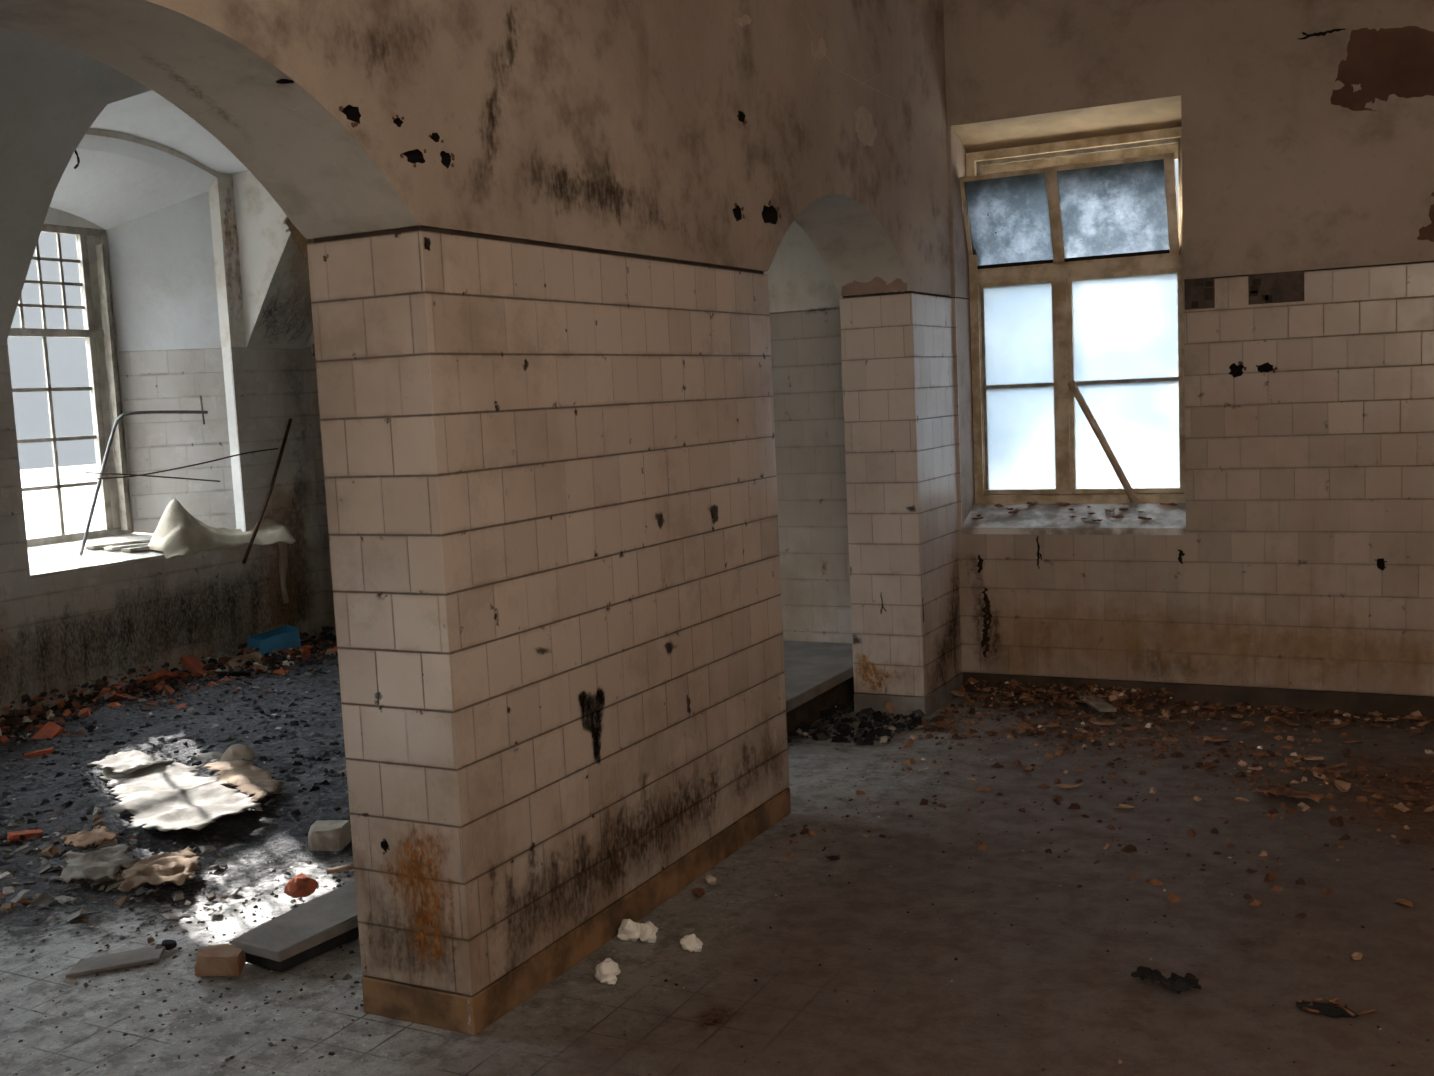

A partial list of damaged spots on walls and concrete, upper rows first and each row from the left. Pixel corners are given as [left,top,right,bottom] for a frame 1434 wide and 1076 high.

peeling [1330,15,1434,111]
peeling [283,217,313,259]
peeling [1408,190,1434,242]
peeling [841,277,908,296]
damp [579,689,605,763]
corrosion [388,830,454,959]
damp [491,776,717,968]